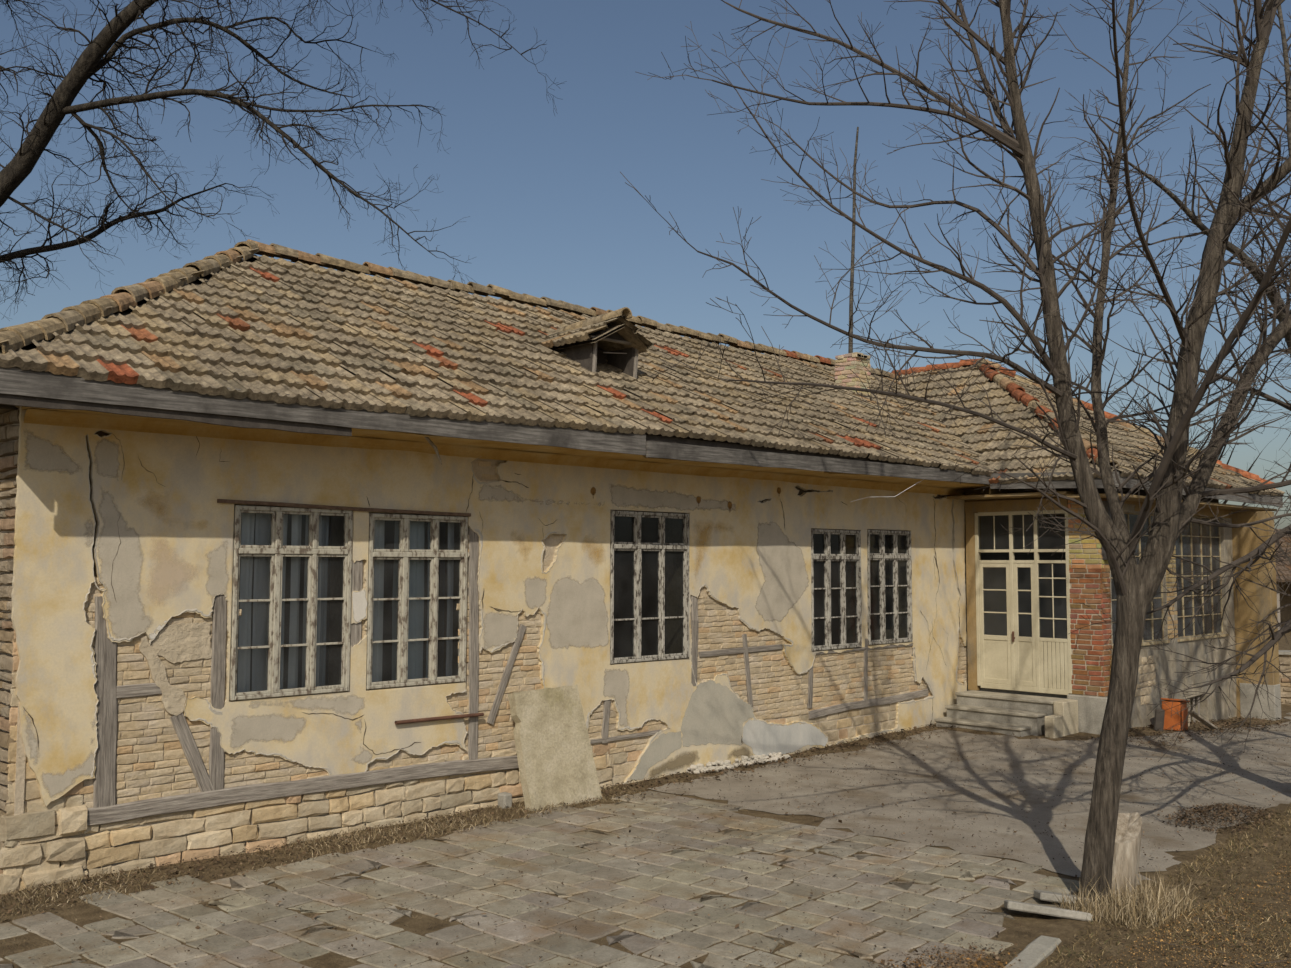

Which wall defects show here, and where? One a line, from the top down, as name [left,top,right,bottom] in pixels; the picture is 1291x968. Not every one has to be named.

crack [85,434,165,603]
flaking render [26,493,332,808]
flaking render [354,529,609,772]
flaking render [690,522,934,746]